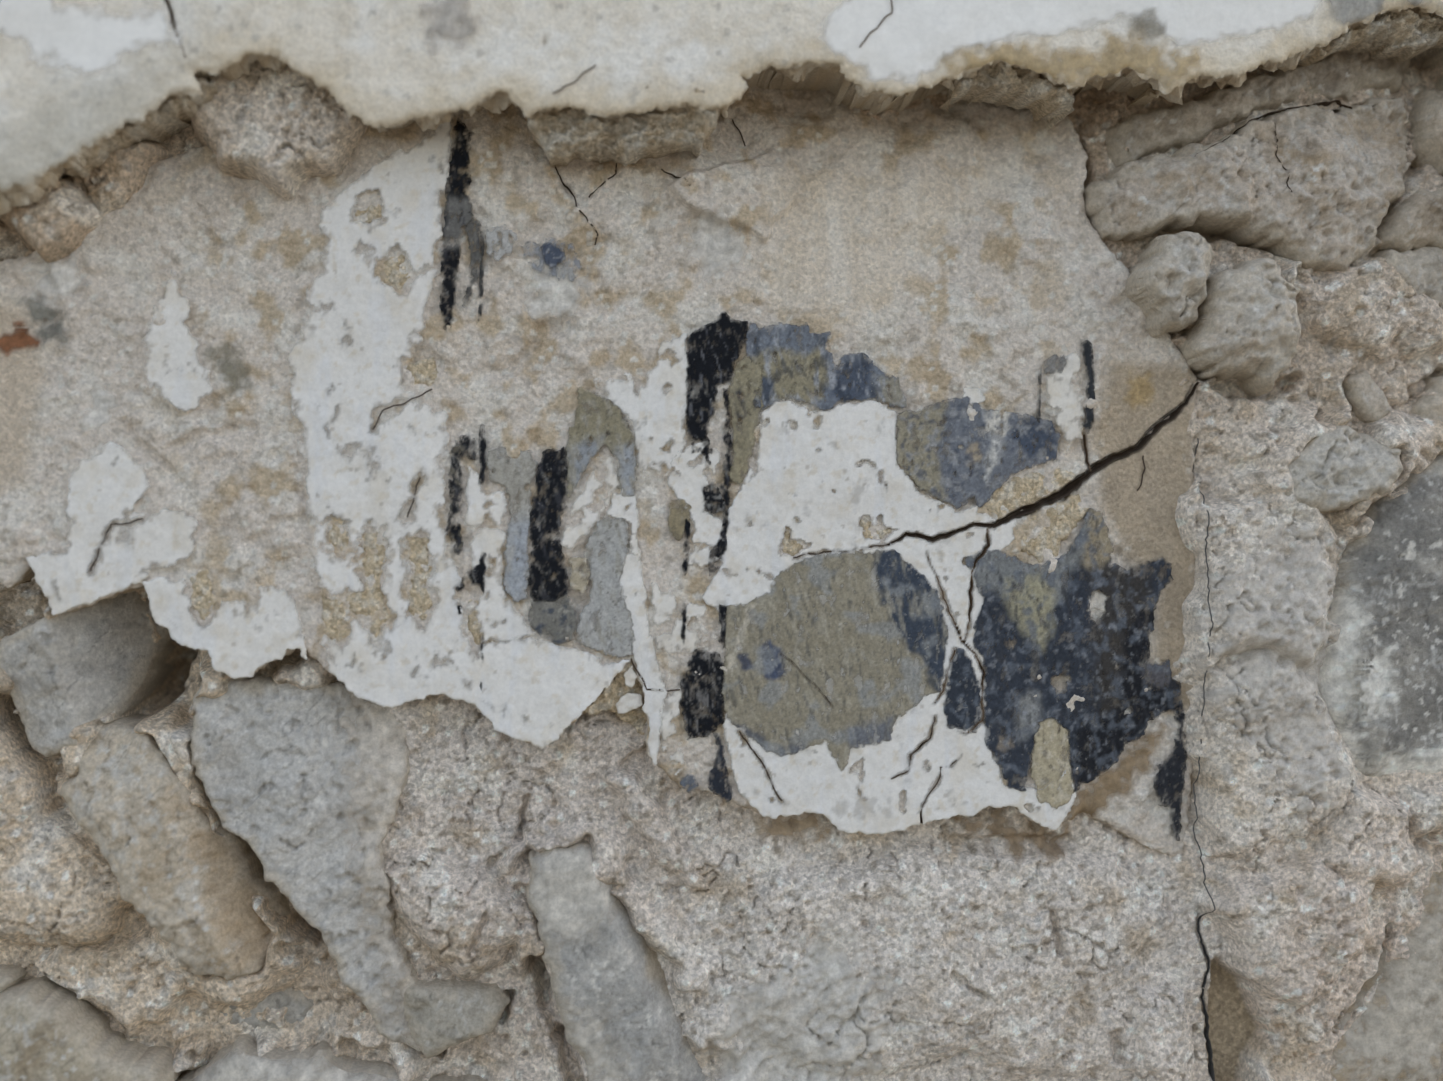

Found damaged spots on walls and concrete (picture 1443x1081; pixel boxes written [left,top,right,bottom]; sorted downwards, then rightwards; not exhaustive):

crack [165,0,187,58]
crack [859,0,893,48]
spalling [66,77,218,180]
spalling [527,87,720,167]
peeling [26,120,1187,841]
crack [793,382,1216,1081]